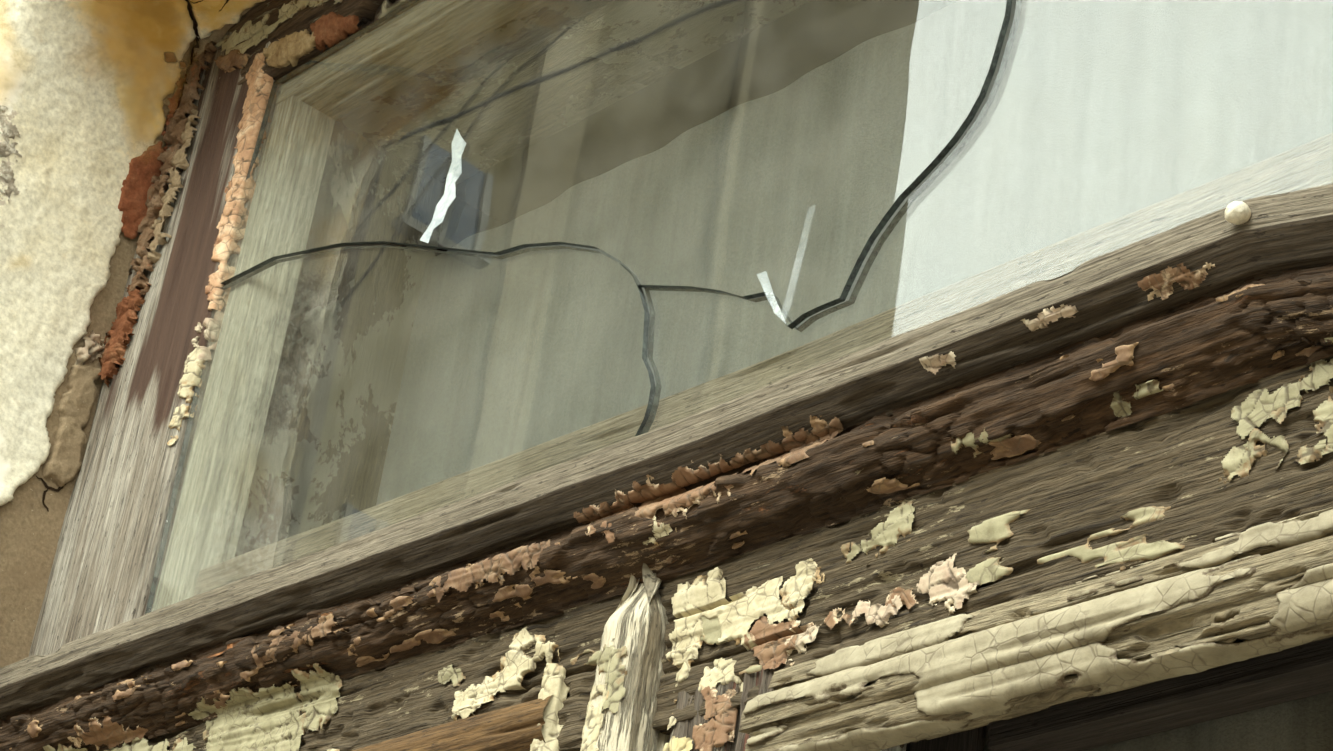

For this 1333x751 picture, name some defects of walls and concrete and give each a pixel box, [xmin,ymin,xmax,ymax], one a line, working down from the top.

damp [165,52,186,68]
crack [179,0,229,104]
peeling [42,0,362,487]
peeling [1020,304,1078,332]
peeling [429,540,562,602]
peeling [574,415,843,545]
peeling [841,501,915,564]
peeling [1218,359,1333,484]
peeling [43,613,347,751]
peeling [438,627,570,751]
peeling [580,644,628,751]
peeling [663,553,980,751]